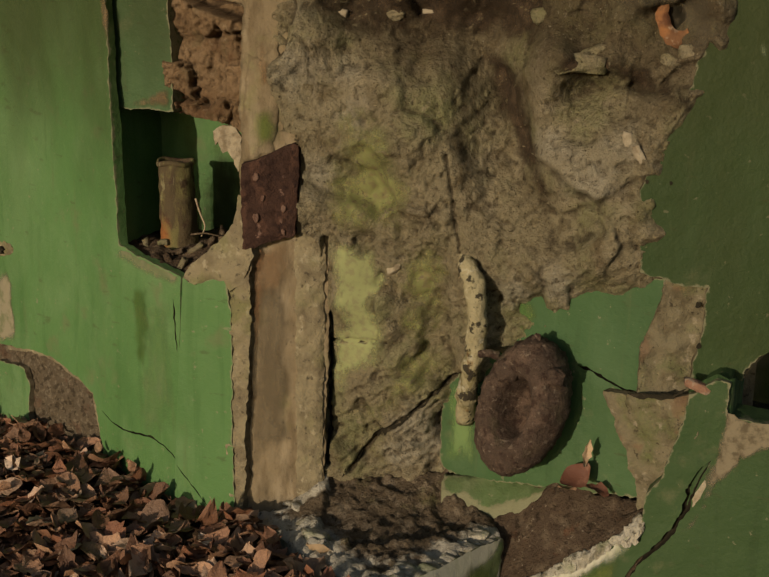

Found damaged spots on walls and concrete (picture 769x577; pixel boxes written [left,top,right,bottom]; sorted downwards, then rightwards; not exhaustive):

spalling [162,0,244,132]
spalling [266,0,738,510]
spalling [0,275,104,453]
crack [171,302,179,345]
crack [104,413,207,505]
crack [630,461,716,576]